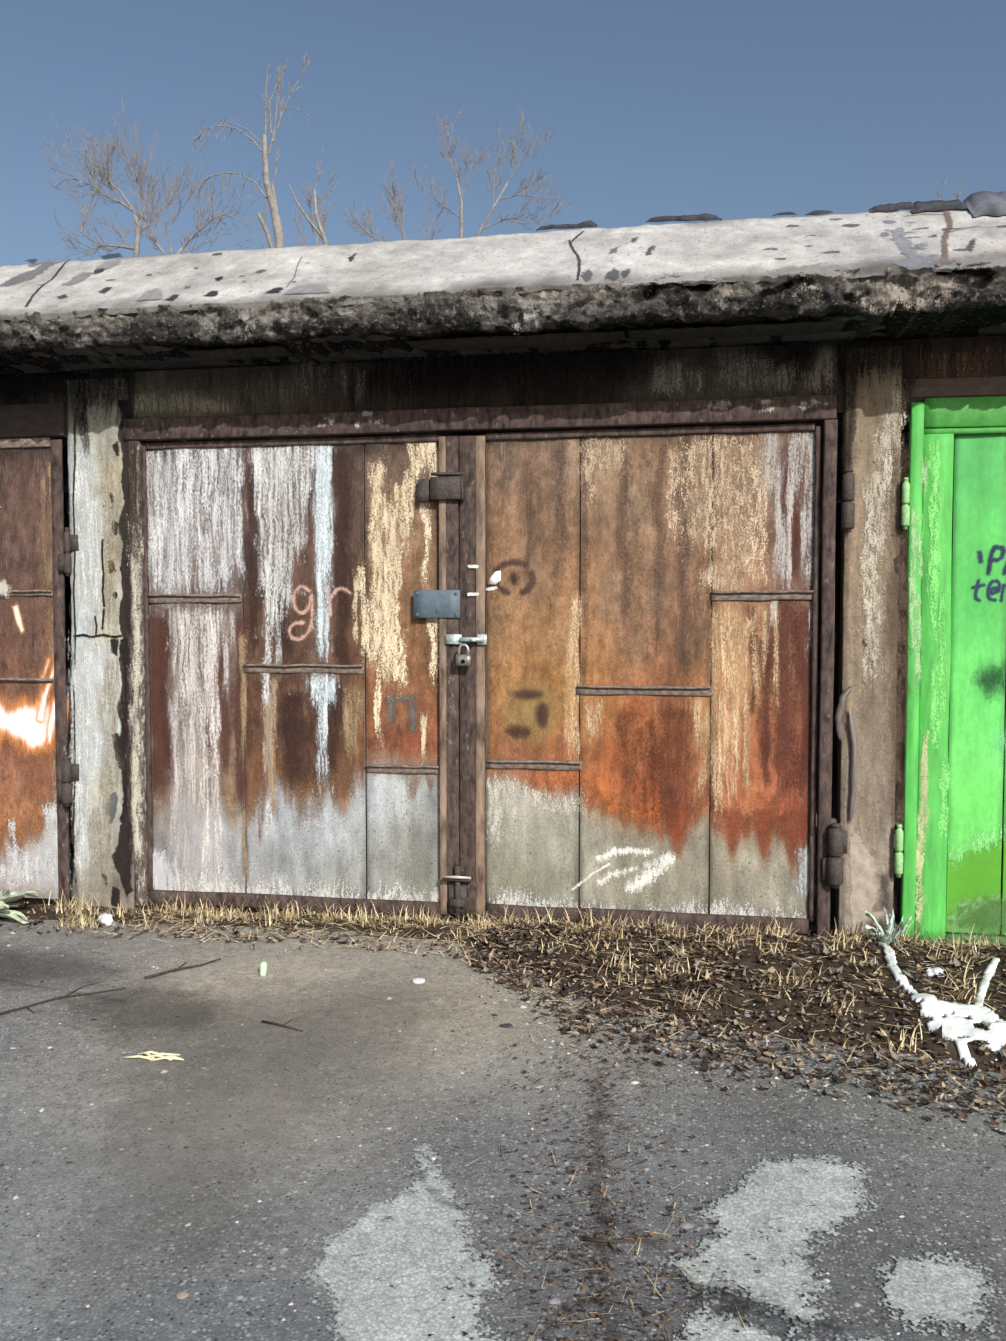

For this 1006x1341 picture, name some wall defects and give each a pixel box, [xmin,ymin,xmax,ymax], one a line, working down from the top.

crack [24,259,70,307]
spalling [196,276,296,341]
spalling [465,298,545,331]
crack [569,231,584,280]
spalling [856,220,975,315]
rust [0,449,55,710]
peeling [351,432,440,748]
rust [123,440,440,871]
rust [487,433,814,873]
peeling [420,708,428,762]
rust [0,733,57,856]
peeling [155,863,440,902]